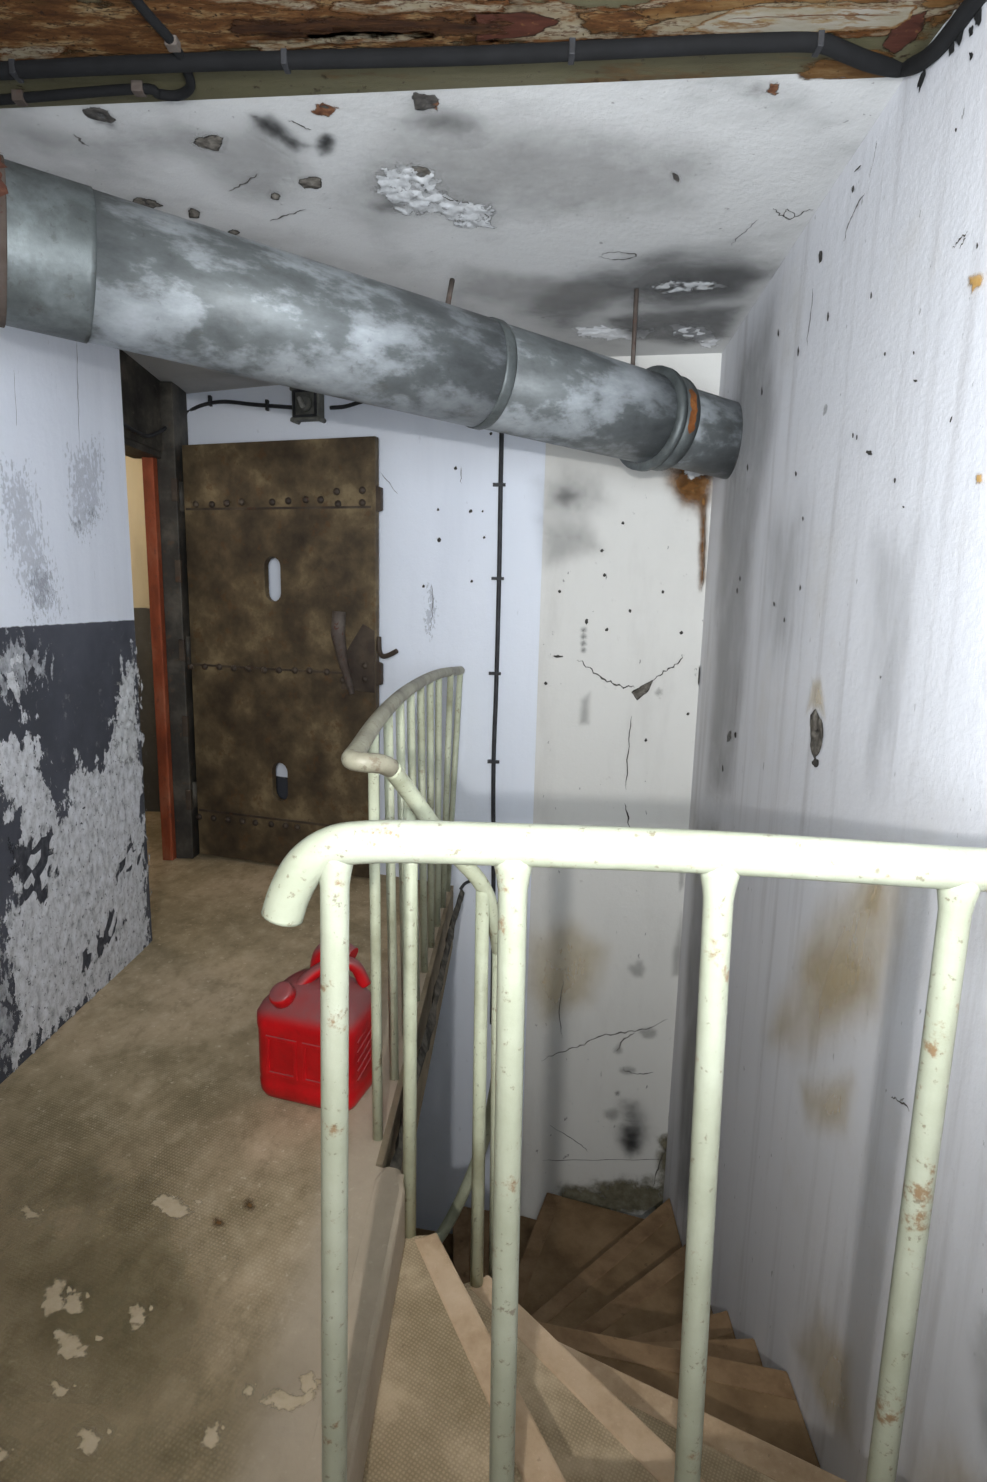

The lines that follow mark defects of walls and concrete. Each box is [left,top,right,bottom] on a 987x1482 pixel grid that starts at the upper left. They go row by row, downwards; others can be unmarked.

peeling [469,0,963,54]
peeling [374,163,496,229]
leakage [572,325,647,341]
leakage [672,327,721,348]
rust [670,468,711,586]
crack [554,655,683,827]
peeling [0,629,152,1076]
crack [542,983,664,1075]
crack [544,1125,661,1161]